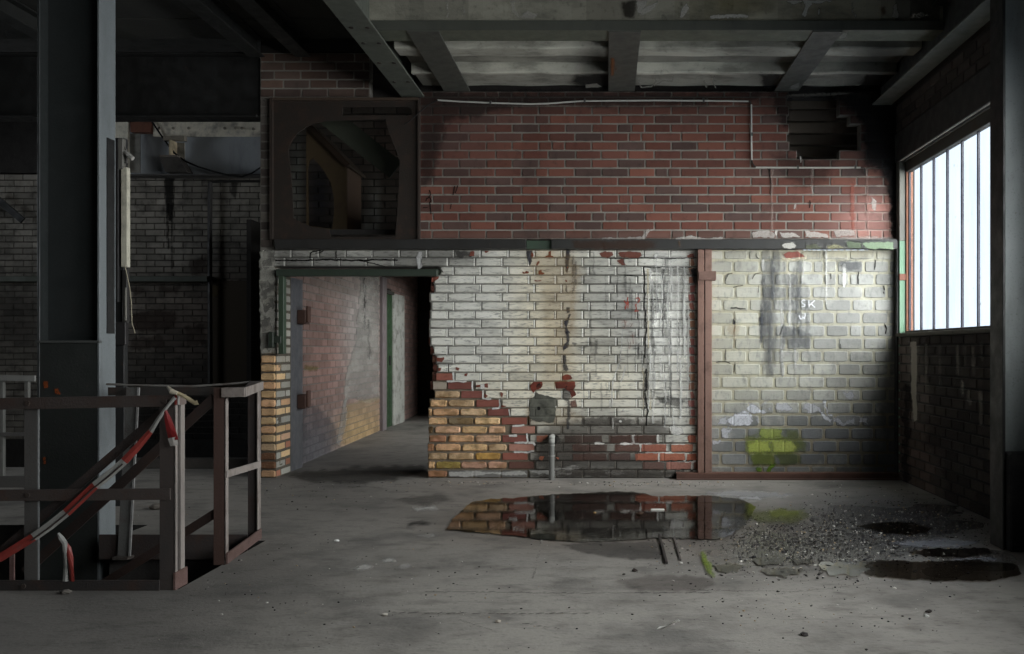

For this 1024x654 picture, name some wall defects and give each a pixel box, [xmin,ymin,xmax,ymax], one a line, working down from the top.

spalling [428,251,697,478]
water stain [563,389,571,429]
crack [607,257,694,426]
water stain [620,253,696,469]
water stain [759,259,805,376]